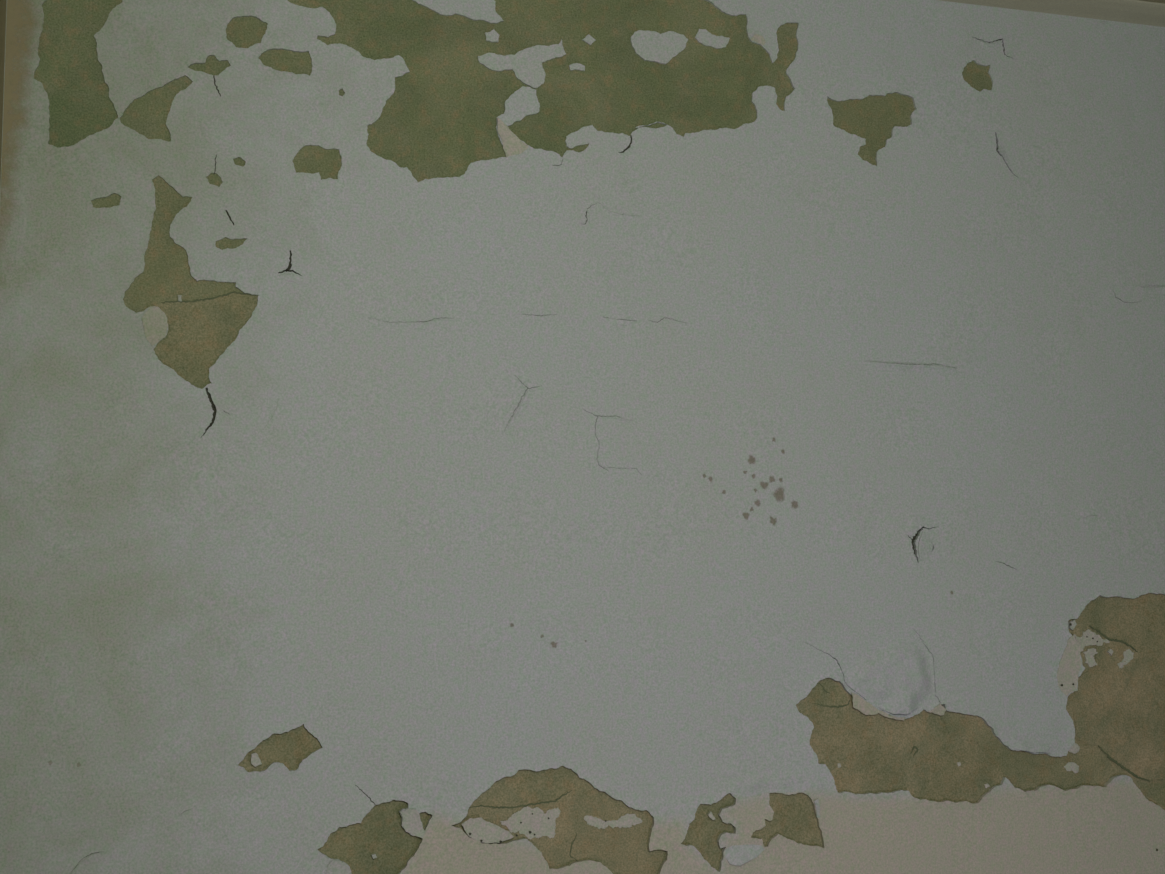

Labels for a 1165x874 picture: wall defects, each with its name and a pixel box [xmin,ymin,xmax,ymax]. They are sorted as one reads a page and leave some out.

peeling [34,0,230,148]
peeling [226,16,312,76]
peeling [288,0,798,182]
peeling [827,93,916,165]
peeling [123,176,258,389]
crack [201,388,224,437]
crack [911,527,934,560]
peeling [796,593,1165,810]
peeling [238,724,322,772]
peeling [318,785,426,874]
peeling [452,766,666,874]
peeling [681,793,734,871]